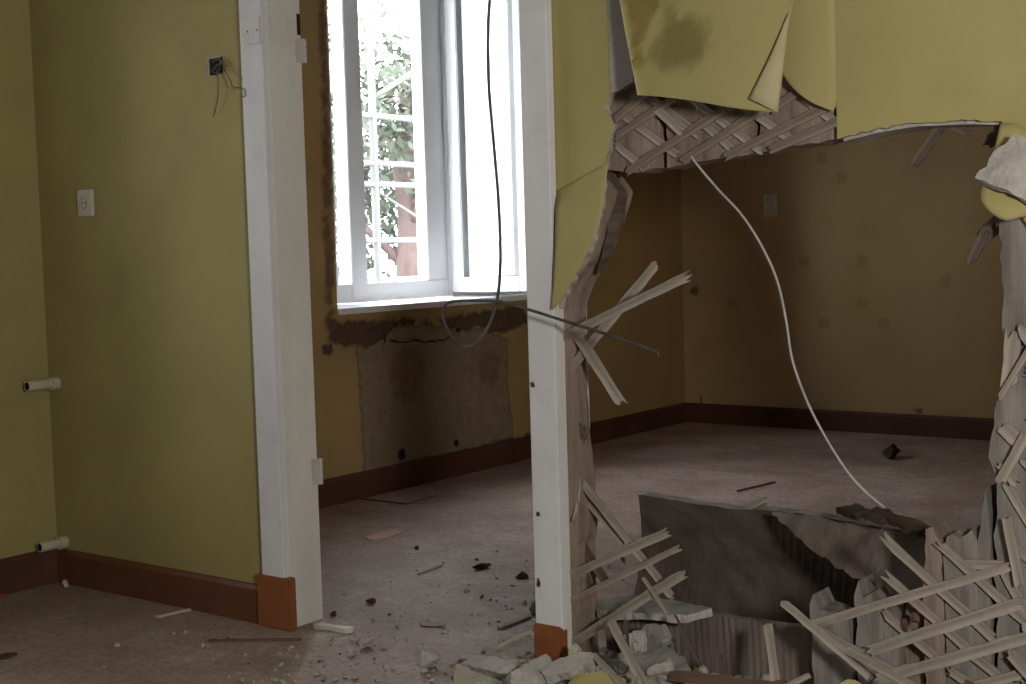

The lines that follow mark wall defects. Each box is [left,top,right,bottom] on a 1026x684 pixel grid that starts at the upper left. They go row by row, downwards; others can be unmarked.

peeling [356,324,513,471]
flaking render [563,0,846,655]
flaking render [988,217,1026,684]